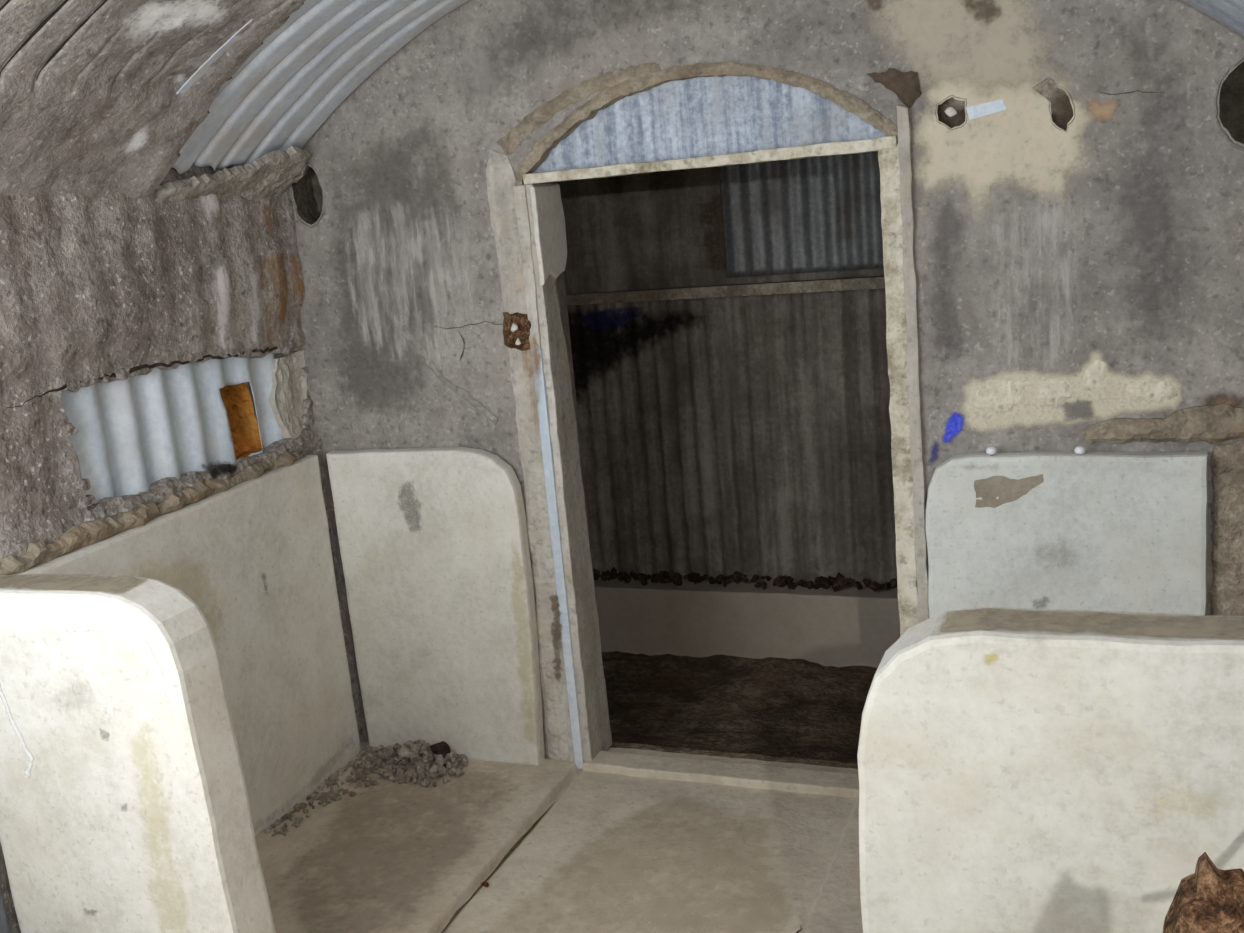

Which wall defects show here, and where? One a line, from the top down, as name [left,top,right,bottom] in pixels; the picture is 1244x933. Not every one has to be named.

peeling [867,0,1116,210]
damp [345,145,471,400]
spalling [0,340,315,575]
spalling [974,474,1044,508]
peeling [961,351,1182,432]